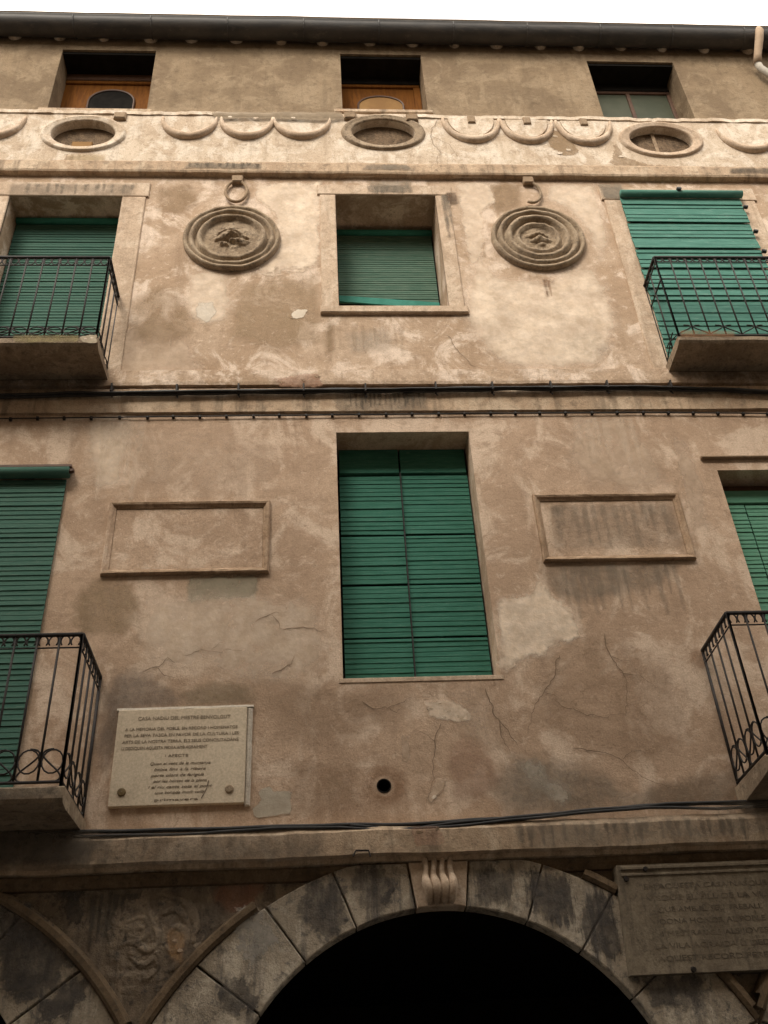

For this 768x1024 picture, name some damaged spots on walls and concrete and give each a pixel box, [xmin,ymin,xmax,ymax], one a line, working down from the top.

peeling [189,273,228,322]
spalling [290,309,307,319]
spalling [425,700,472,722]
crack [485,635,655,751]